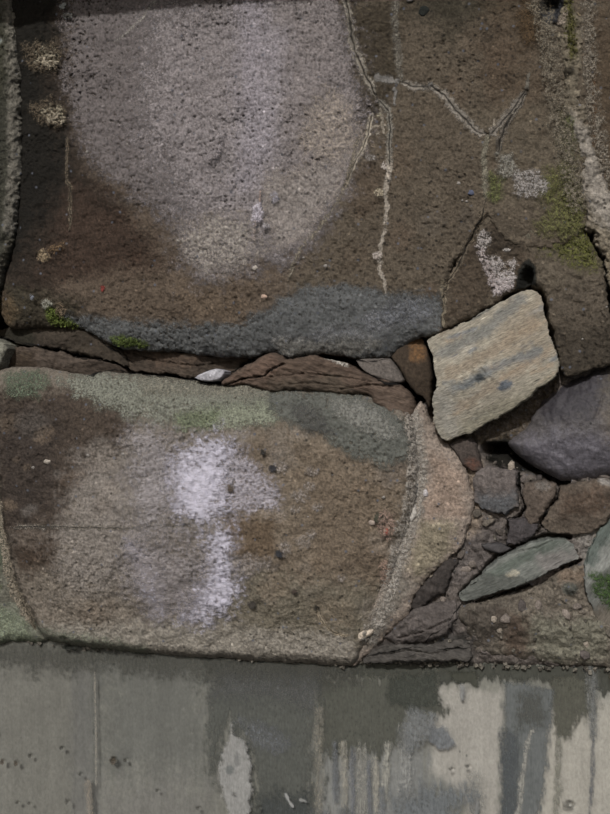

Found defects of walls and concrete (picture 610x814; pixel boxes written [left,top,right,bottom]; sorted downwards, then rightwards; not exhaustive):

crack [342,0,531,329]
efflorescence [494,152,550,198]
efflorescence [476,229,517,296]
water stain [117,425,287,633]
water stain [0,642,610,814]